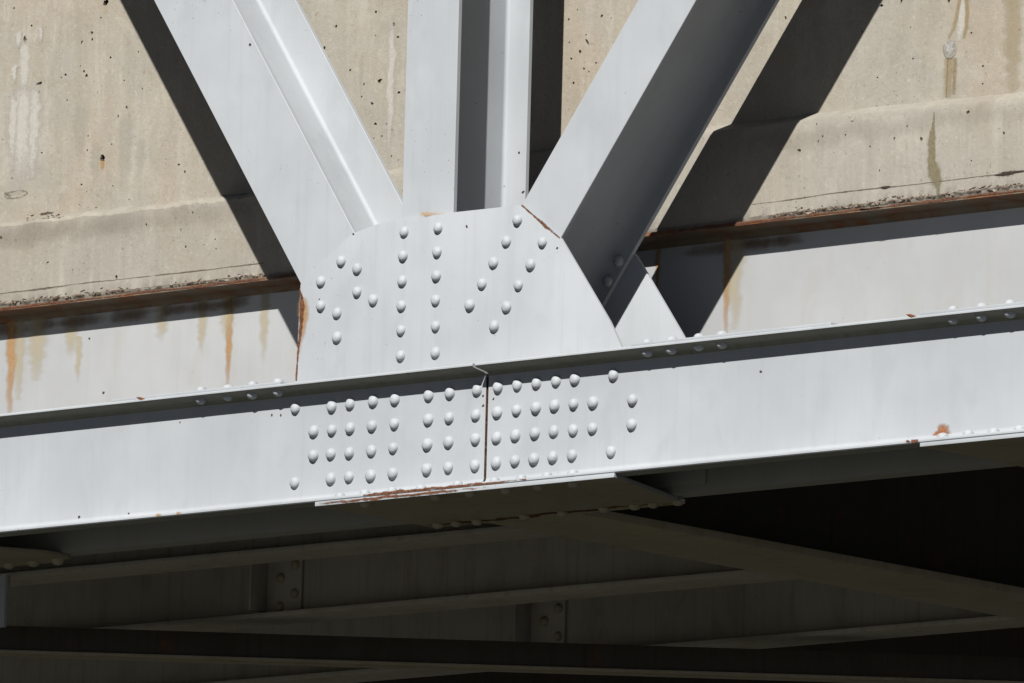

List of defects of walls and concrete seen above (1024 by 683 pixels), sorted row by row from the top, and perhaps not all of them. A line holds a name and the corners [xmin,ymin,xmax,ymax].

damp [928,114,941,194]
corrosion [0,274,295,393]
corrosion [295,288,307,381]
corrosion [325,377,526,504]